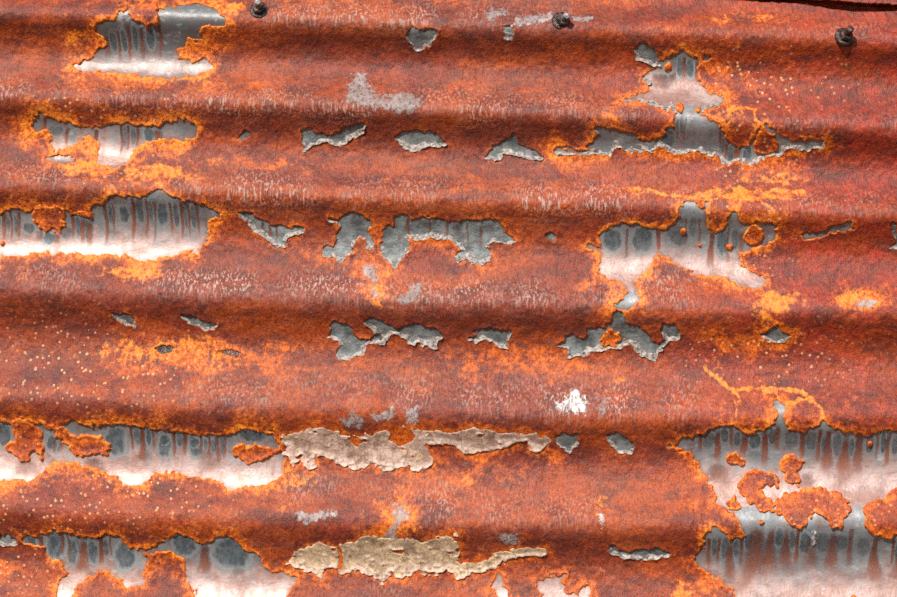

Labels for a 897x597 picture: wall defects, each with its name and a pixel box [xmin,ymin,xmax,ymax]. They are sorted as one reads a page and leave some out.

peeling [73,2,226,80]
peeling [32,111,197,169]
peeling [395,130,447,152]
peeling [553,43,825,166]
peeling [0,189,220,262]
peeling [238,212,305,248]
peeling [322,212,516,297]
peeling [558,200,777,361]
peeling [326,317,443,361]
peeling [0,405,579,491]
peeling [668,400,897,597]
peeling [0,529,547,597]